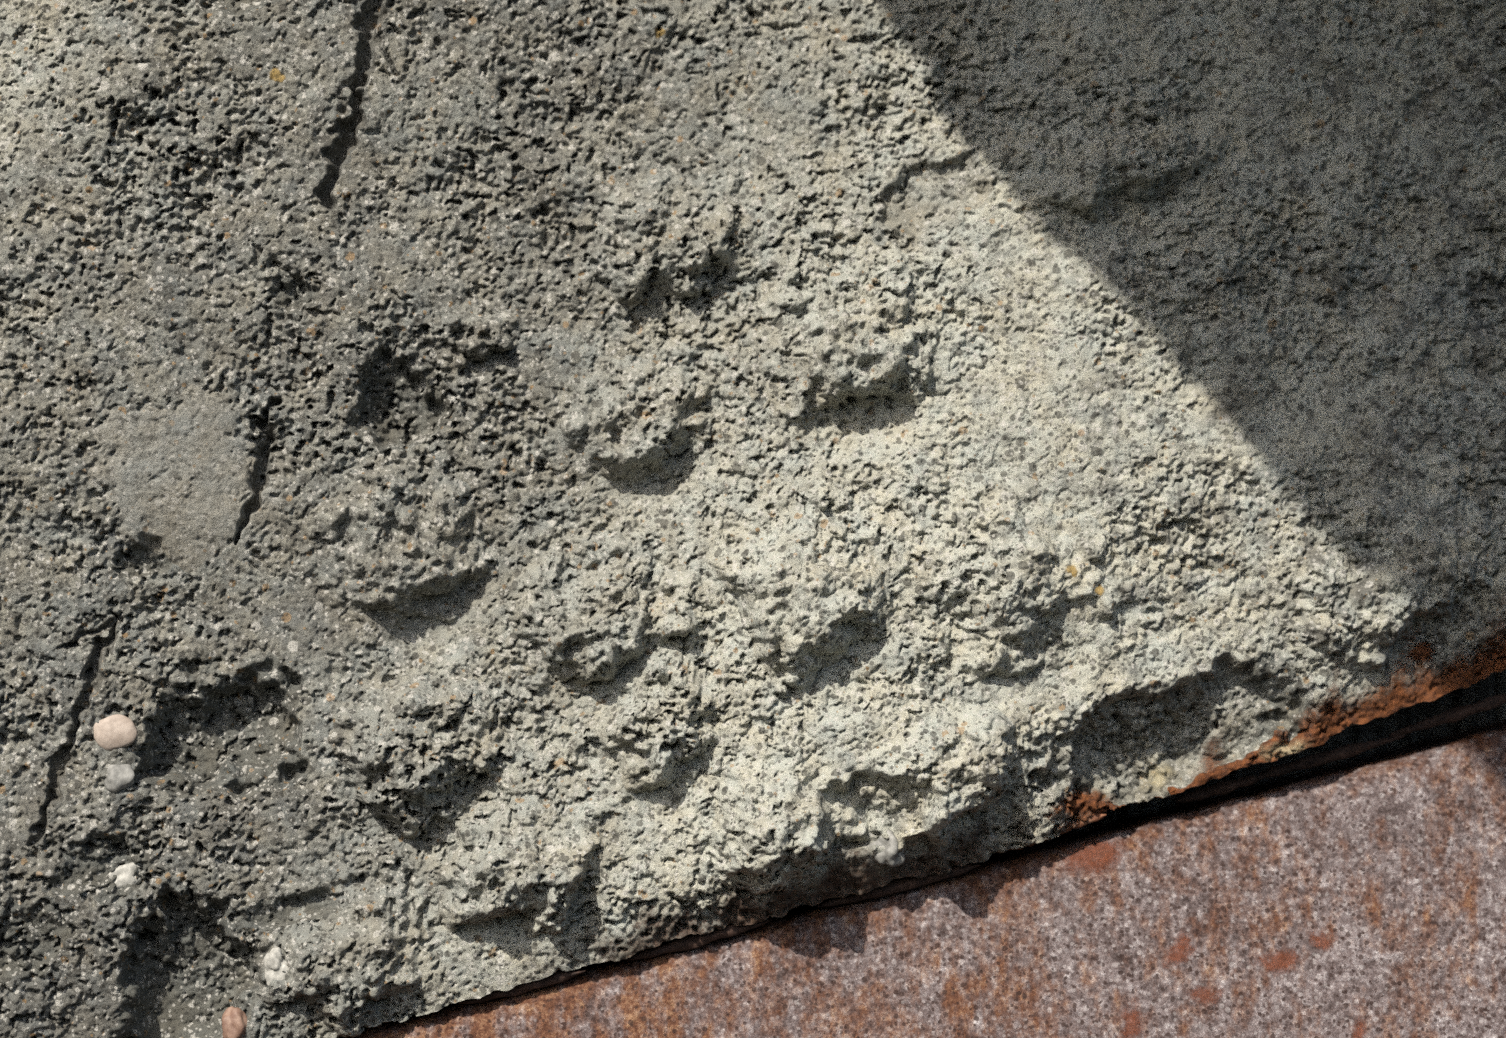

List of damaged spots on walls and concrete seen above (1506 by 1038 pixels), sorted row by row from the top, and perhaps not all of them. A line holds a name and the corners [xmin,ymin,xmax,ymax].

crack [313,0,400,210]
crack [26,612,124,848]
rust [614,842,984,958]
rust [1053,791,1124,828]
rust [1069,843,1116,868]
rust [1151,628,1506,799]